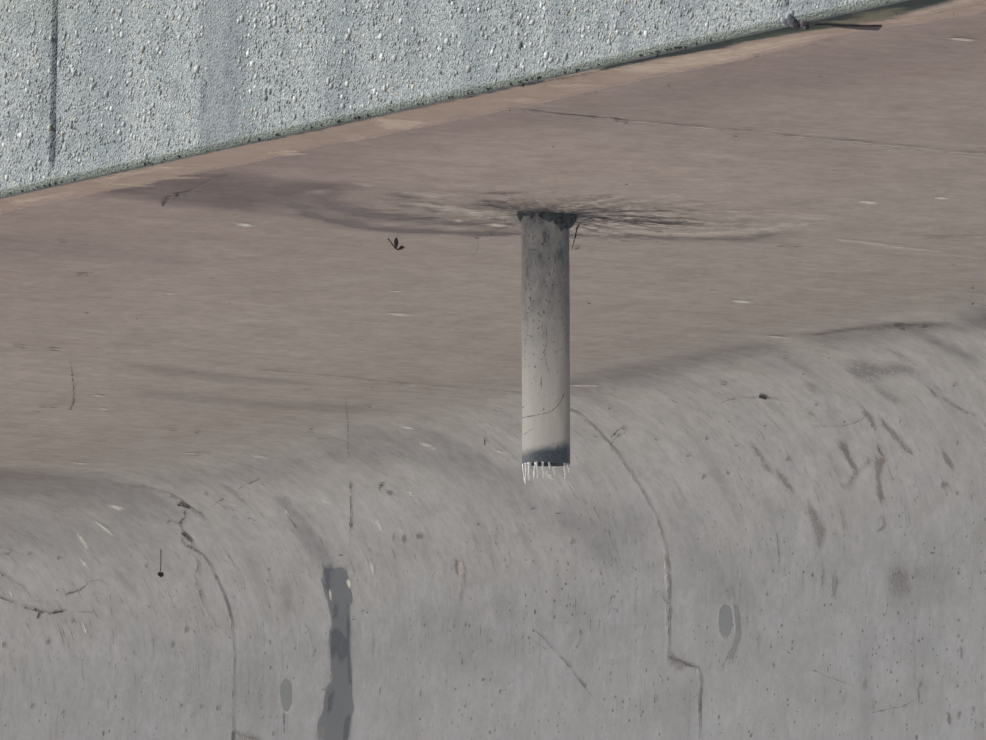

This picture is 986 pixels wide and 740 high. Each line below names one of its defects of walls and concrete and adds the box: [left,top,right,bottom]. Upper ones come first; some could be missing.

damp [286,197,788,240]
damp [317,567,353,740]